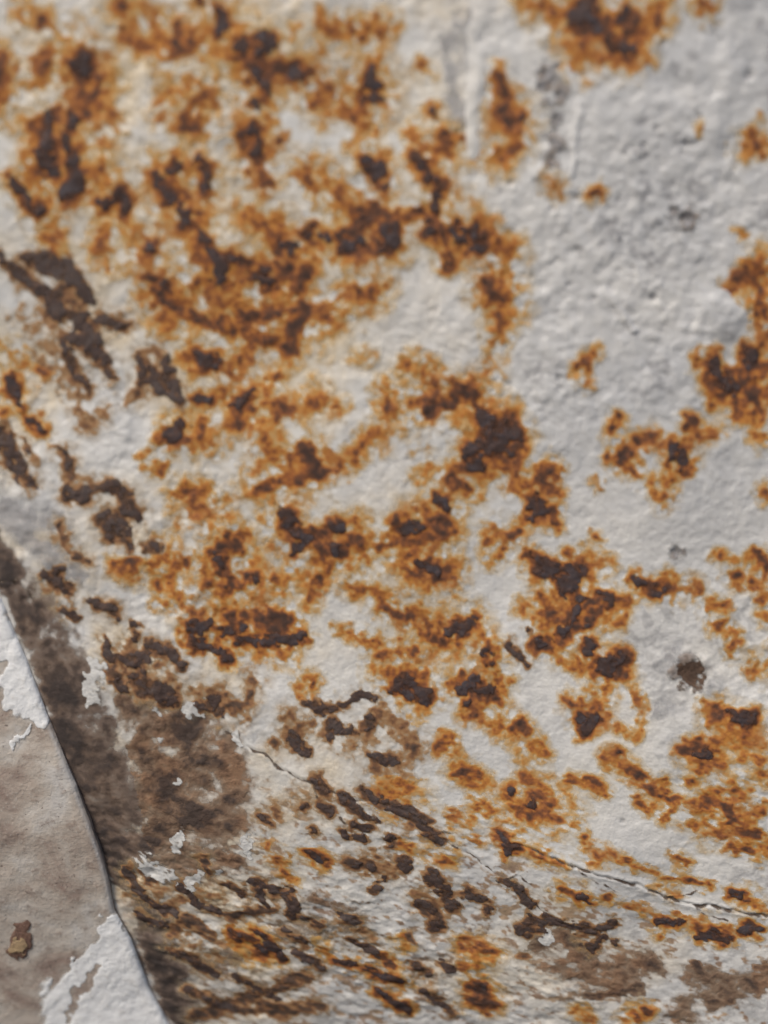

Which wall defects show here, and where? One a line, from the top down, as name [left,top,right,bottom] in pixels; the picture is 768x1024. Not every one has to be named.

rust [0,0,536,673]
rust [588,226,768,509]
leakage [0,498,89,584]
peeling [0,597,49,751]
rust [265,395,768,900]
crack [225,731,363,824]
spalling [6,920,32,961]
peeling [39,913,169,1024]
rust [118,837,462,1023]
crack [423,824,541,910]
rust [495,872,768,958]
crack [532,849,767,921]